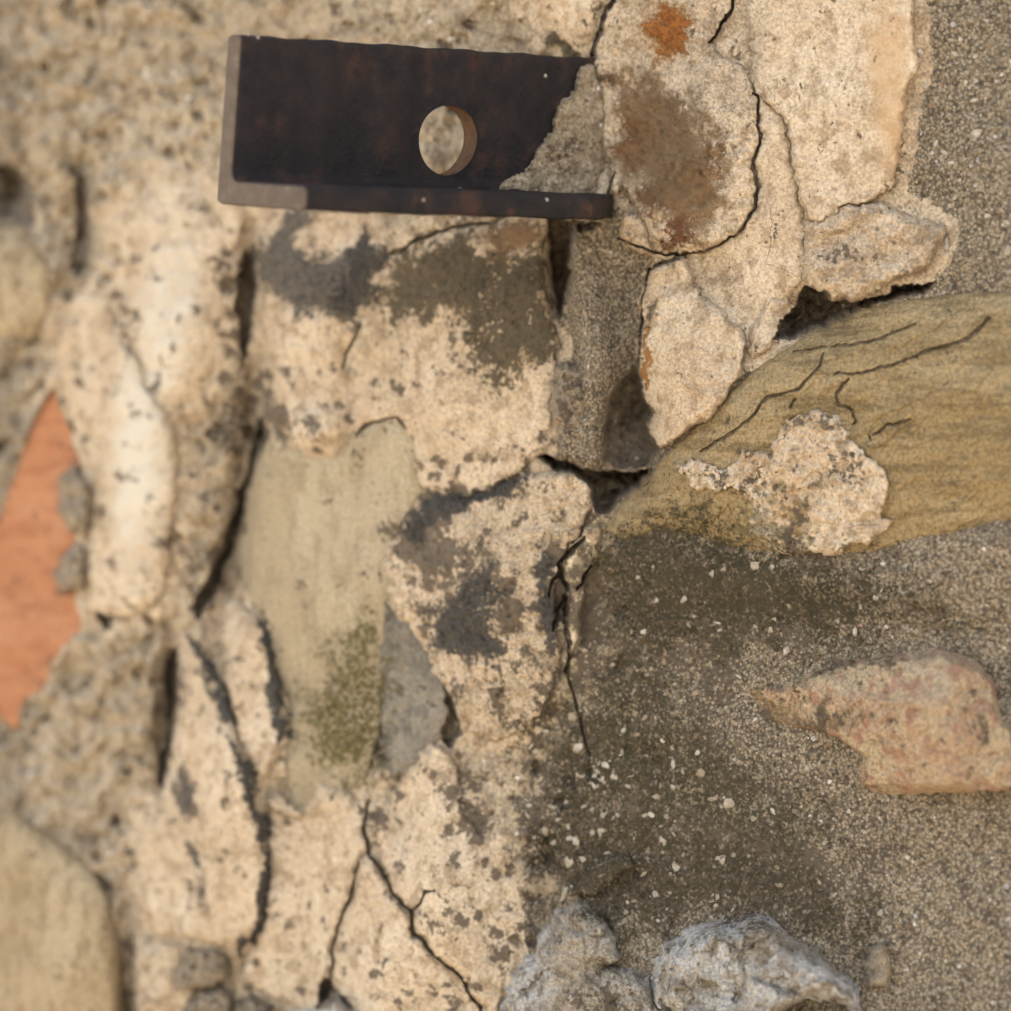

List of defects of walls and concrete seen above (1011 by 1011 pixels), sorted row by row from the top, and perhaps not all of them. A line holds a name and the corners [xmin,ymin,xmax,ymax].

crack [592,0,616,54]
rust [597,0,735,254]
crack [619,94,797,364]
crack [710,0,734,42]
crack [702,318,989,451]
water stain [257,605,412,803]
crack [549,537,591,757]
crack [327,800,481,1011]